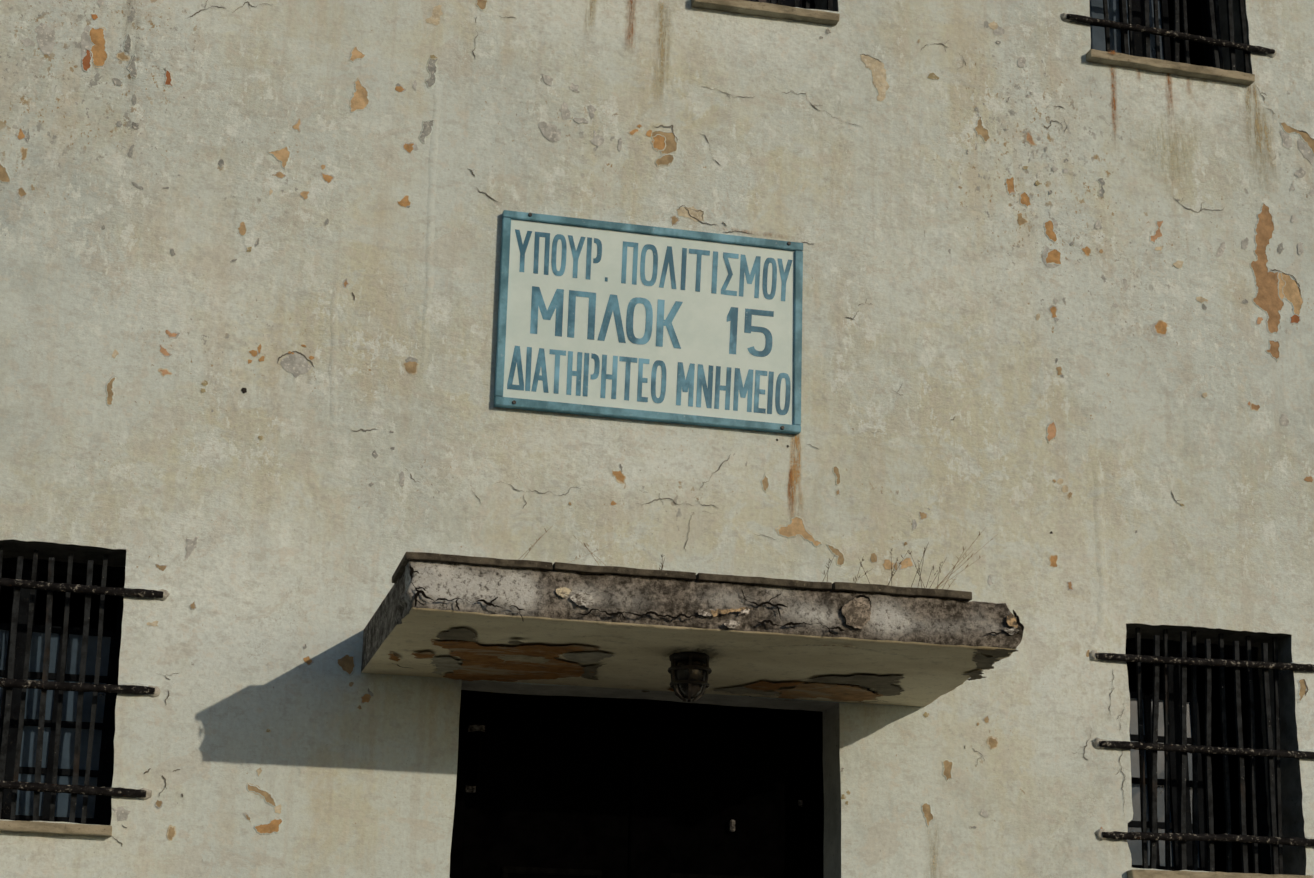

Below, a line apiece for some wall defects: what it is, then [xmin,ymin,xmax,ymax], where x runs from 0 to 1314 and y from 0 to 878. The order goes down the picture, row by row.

crack [184,0,265,19]
peeling [80,0,139,105]
peeling [650,125,678,167]
peeling [1005,166,1103,268]
peeling [1216,202,1304,363]
crack [637,454,731,552]
crack [407,559,525,622]
peeling [388,628,613,682]
crack [576,609,696,621]
crack [741,589,844,636]
spalling [961,610,1024,681]
peeling [243,768,284,835]